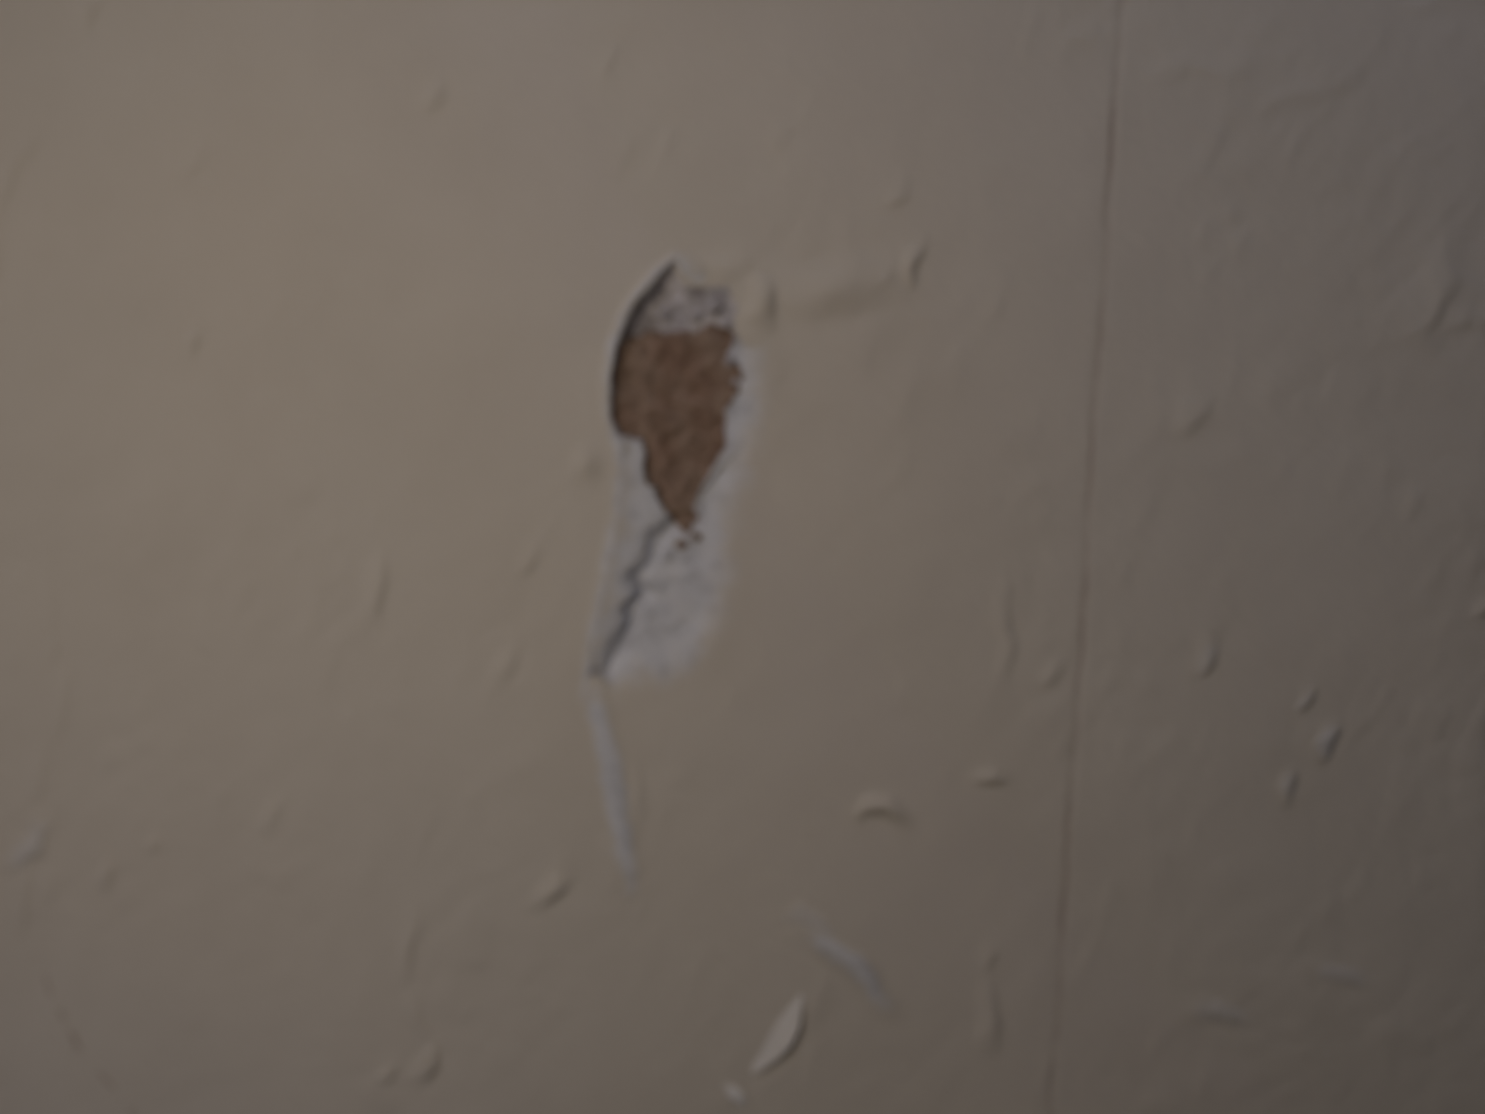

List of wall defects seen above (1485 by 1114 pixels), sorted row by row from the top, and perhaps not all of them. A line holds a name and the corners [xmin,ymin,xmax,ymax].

spalling [563,234,789,731]
peeling [750,993,803,1073]